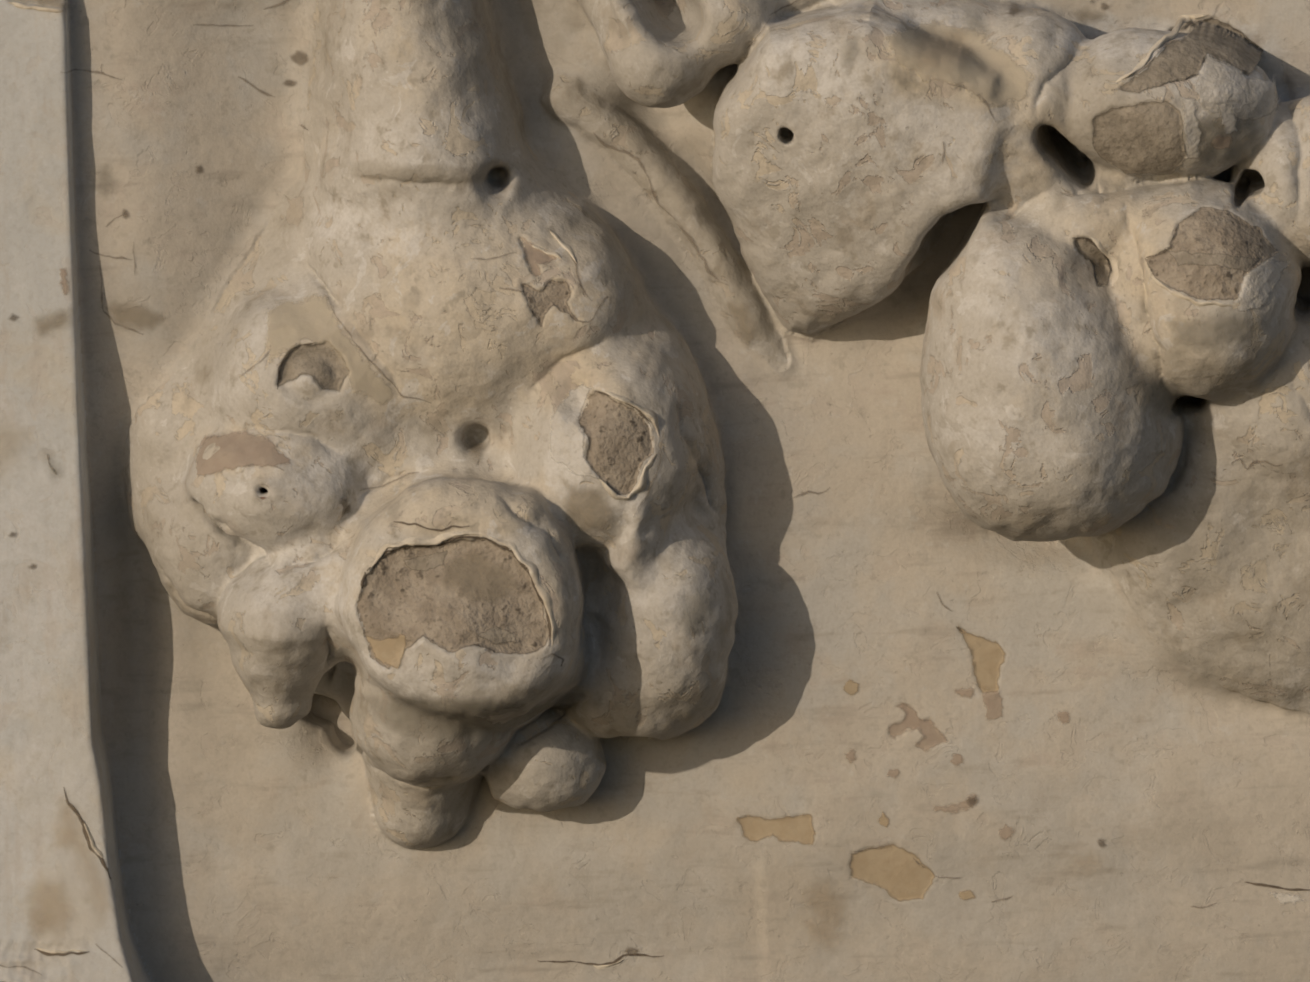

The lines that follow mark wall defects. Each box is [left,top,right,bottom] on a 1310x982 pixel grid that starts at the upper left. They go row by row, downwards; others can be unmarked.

peeling [1093,14,1281,175]
peeling [506,230,585,327]
peeling [1146,207,1288,311]
peeling [265,296,410,404]
peeling [196,431,290,475]
peeling [550,385,660,505]
peeling [357,521,556,669]
peeling [955,627,1005,719]
peeling [889,703,962,765]
crack [64,789,111,879]
peeling [737,814,815,844]
peeling [850,845,935,901]